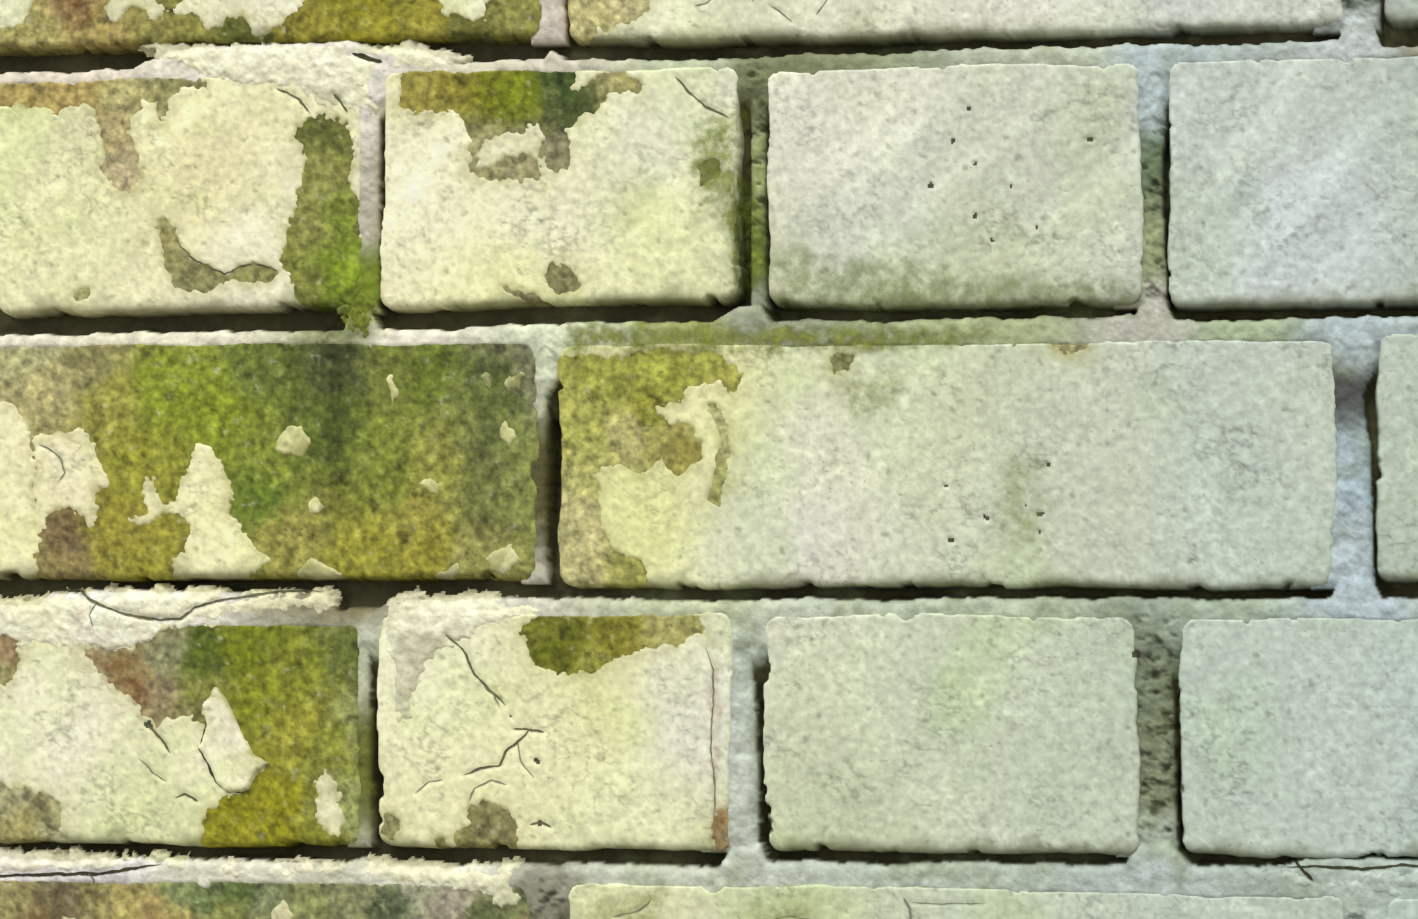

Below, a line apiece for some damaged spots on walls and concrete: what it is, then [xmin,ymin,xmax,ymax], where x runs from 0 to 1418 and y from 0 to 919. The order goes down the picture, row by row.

peeling [0,0,650,312]
peeling [696,158,721,186]
peeling [558,347,744,589]
peeling [0,343,705,919]
crack [416,635,543,801]
peeling [710,808,730,852]